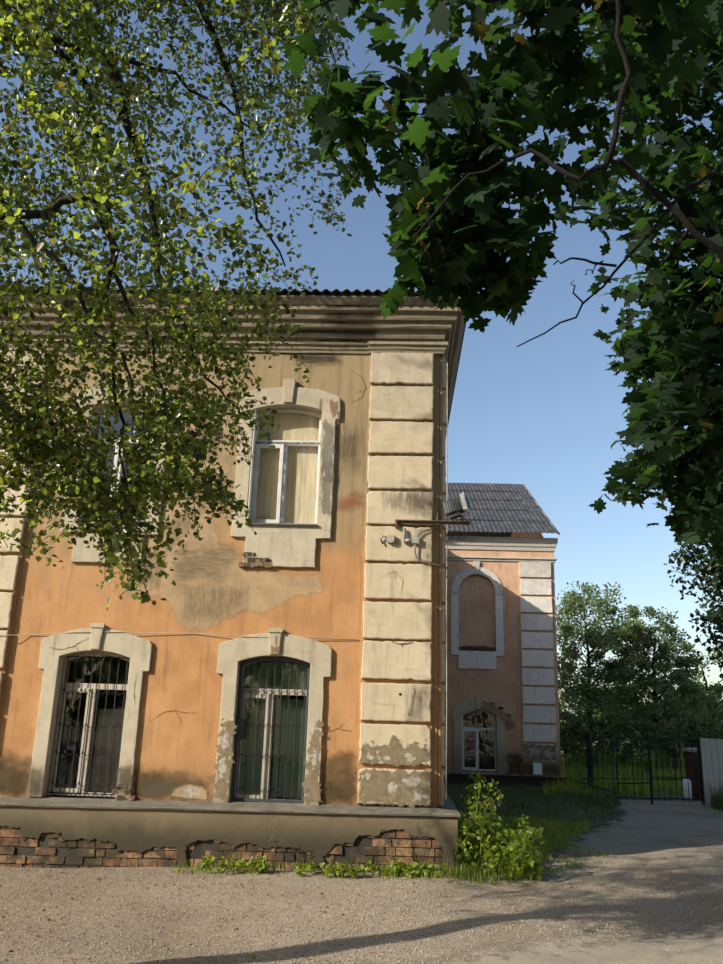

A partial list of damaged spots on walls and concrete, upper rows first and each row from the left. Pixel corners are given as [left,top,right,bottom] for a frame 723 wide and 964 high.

water stain [259,305,380,363]
peeling [122,502,322,629]
peeling [172,718,237,803]
peeling [302,719,324,805]
water stain [325,755,352,799]
peeling [355,735,431,808]